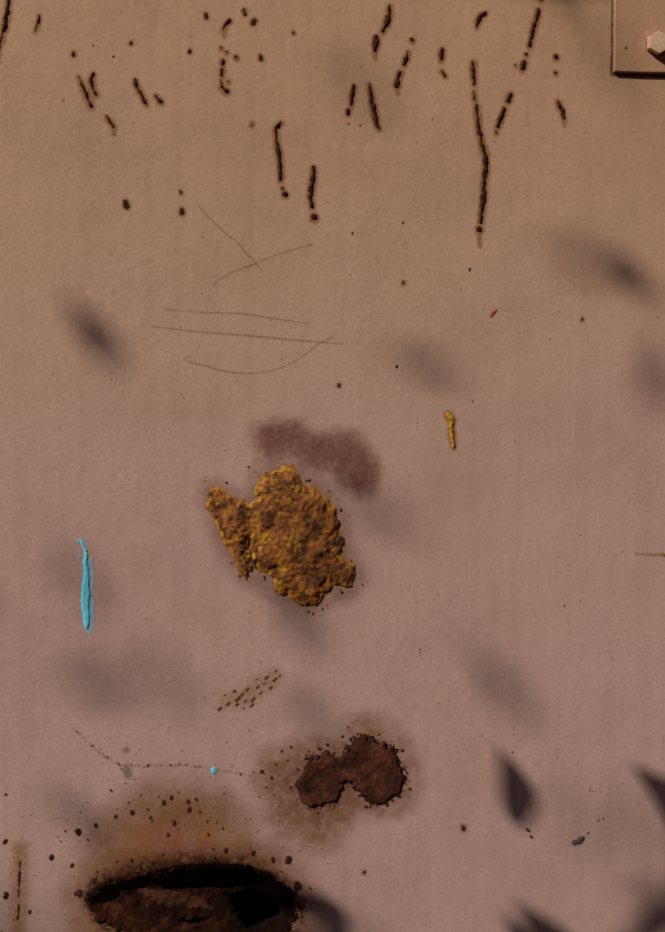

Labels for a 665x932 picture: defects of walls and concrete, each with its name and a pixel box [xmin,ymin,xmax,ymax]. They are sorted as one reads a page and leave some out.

corrosion [0,0,12,47]
corrosion [514,0,543,72]
corrosion [77,72,98,108]
corrosion [345,84,361,126]
corrosion [367,82,381,131]
corrosion [494,92,514,135]
corrosion [272,121,288,198]
corrosion [470,59,489,246]
corrosion [307,165,319,222]
corrosion [203,462,364,616]
corrosion [252,720,411,842]
peeling [74,871,111,910]